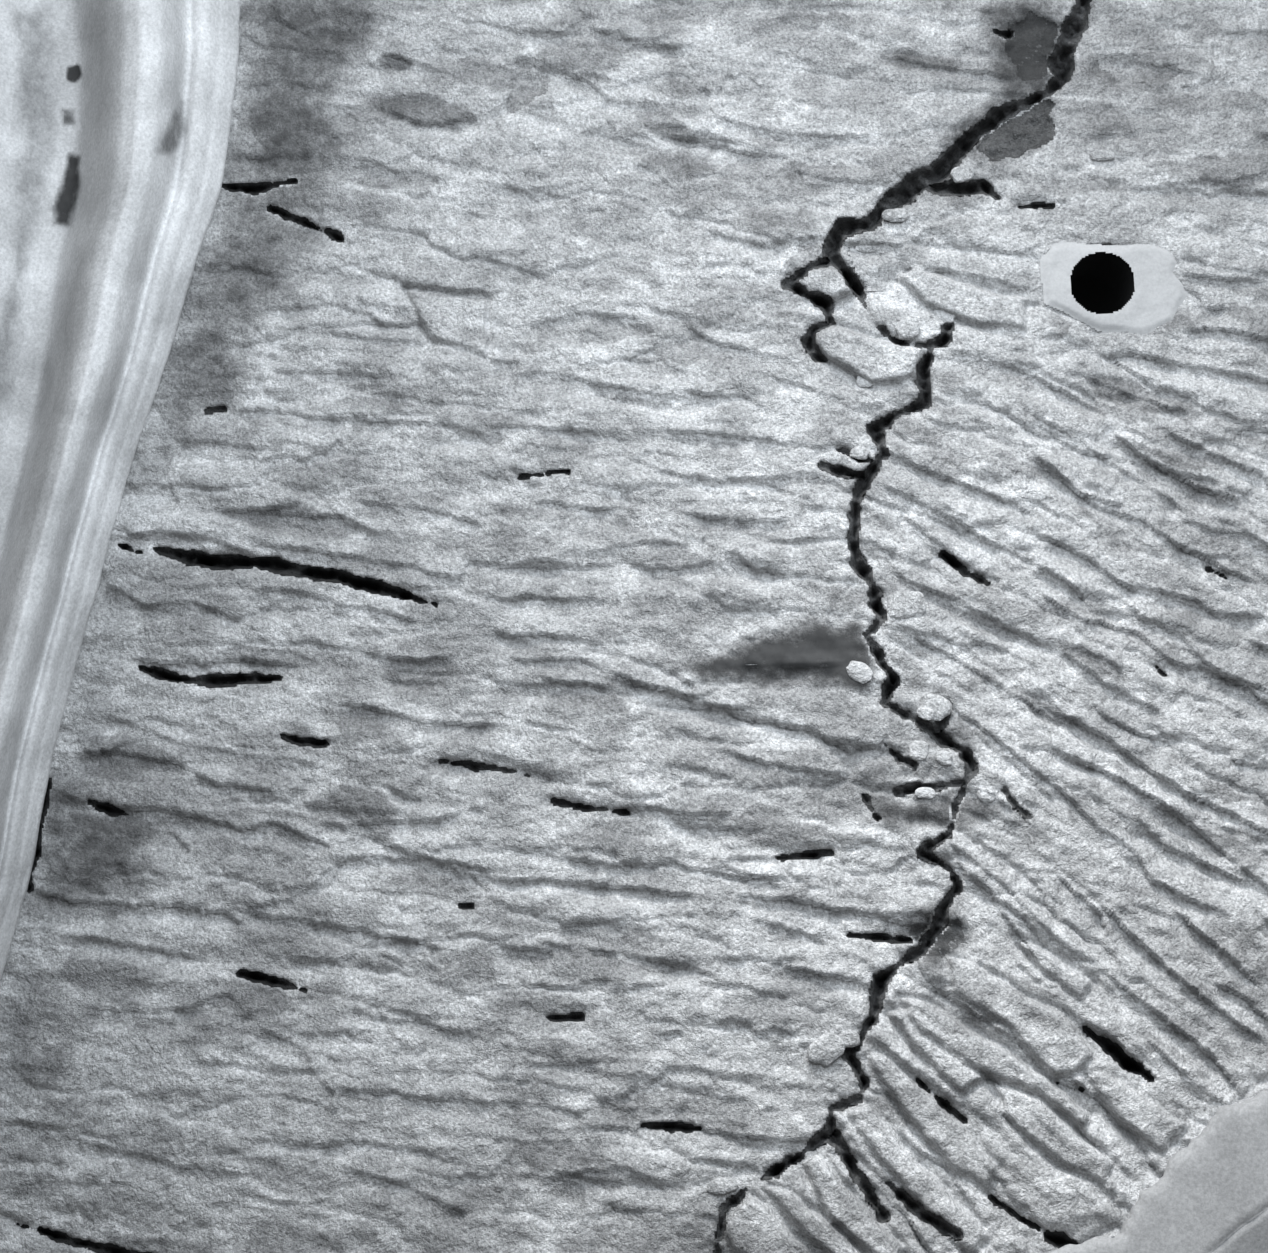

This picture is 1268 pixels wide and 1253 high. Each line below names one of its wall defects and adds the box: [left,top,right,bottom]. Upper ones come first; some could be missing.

crack [707,0,1092,1253]
crack [1089,149,1115,161]